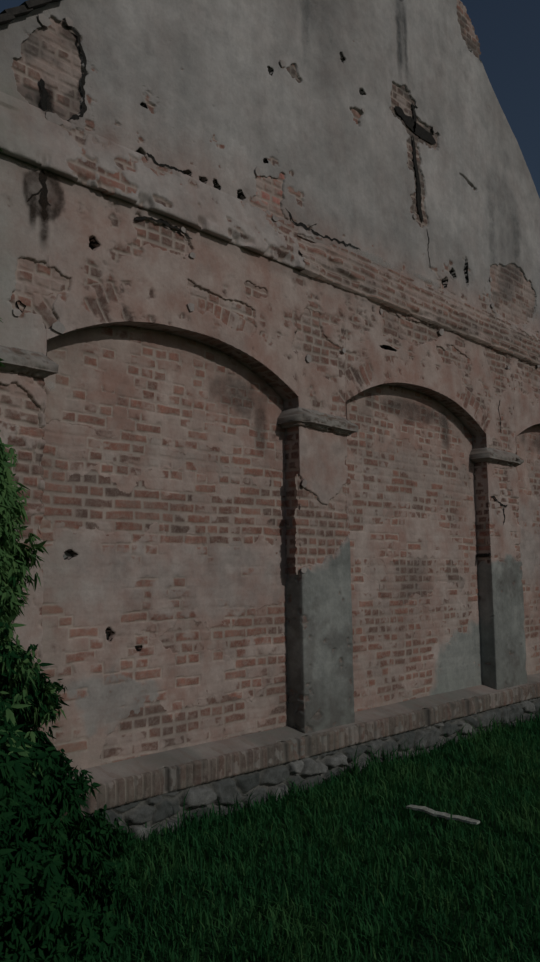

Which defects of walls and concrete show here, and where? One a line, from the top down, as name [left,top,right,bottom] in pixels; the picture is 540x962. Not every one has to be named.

spalling [456,0,481,59]
flaking render [11,14,84,125]
flaking render [390,83,438,228]
flaking render [133,214,195,258]
crack [286,209,360,249]
flaking render [9,258,70,334]
flaking render [489,264,536,324]